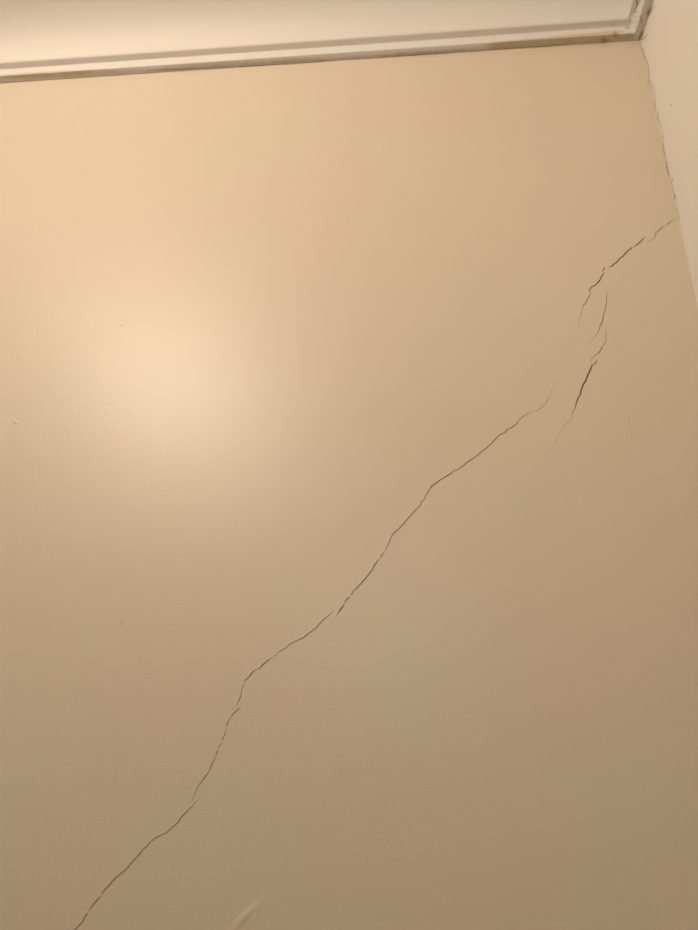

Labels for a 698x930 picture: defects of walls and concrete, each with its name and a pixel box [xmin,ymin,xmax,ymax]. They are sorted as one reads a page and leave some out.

crack [544,0,680,457]
crack [73,379,560,930]